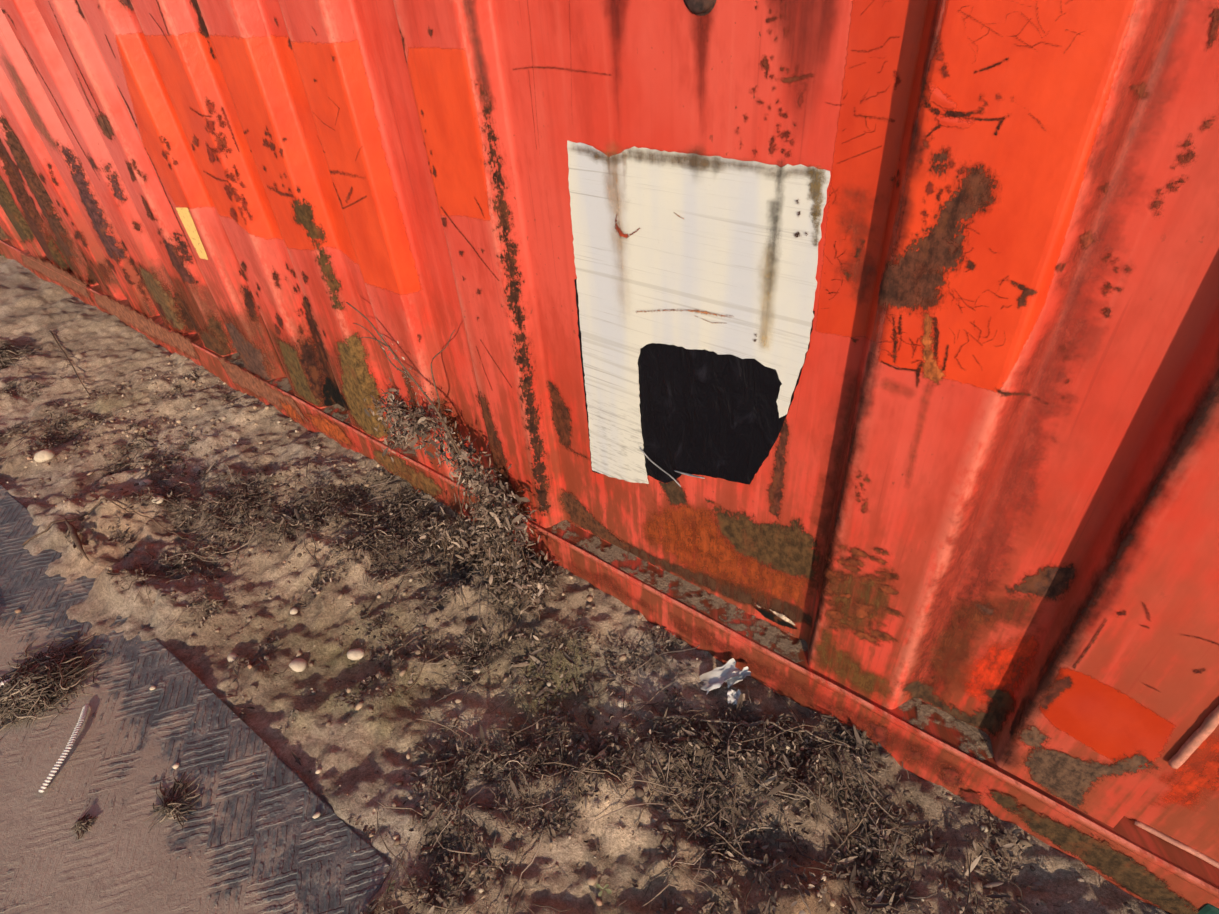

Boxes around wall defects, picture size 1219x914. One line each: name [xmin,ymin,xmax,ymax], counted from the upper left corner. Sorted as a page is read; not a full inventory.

rust [0,112,443,498]
rust [464,0,630,549]
rust [647,341,877,645]
rust [843,122,997,315]
rust [675,618,1199,914]
rust [904,371,1219,814]